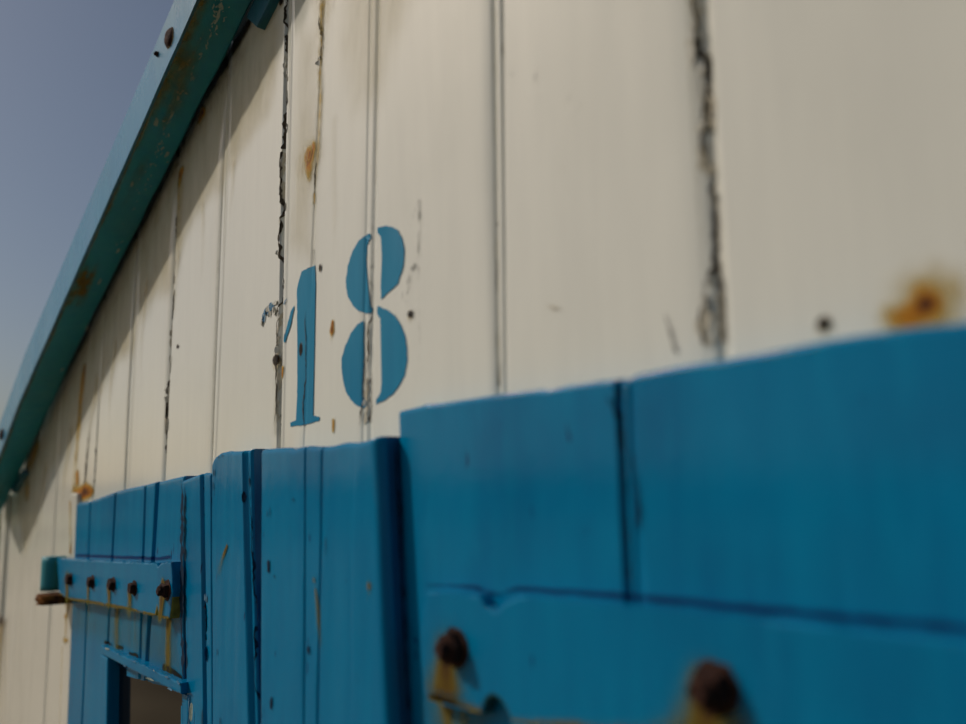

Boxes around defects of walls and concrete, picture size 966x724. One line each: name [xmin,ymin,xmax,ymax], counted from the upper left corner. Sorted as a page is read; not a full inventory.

crack [315,0,323,66]
corrosion [44,0,205,351]
corrosion [304,141,316,179]
crack [686,0,727,347]
crack [274,0,306,426]
peeling [261,299,287,326]
corrosion [884,278,958,331]
corrosion [69,470,94,516]
corrosion [63,573,171,672]
corrosion [427,657,480,724]
corrosion [682,670,738,724]